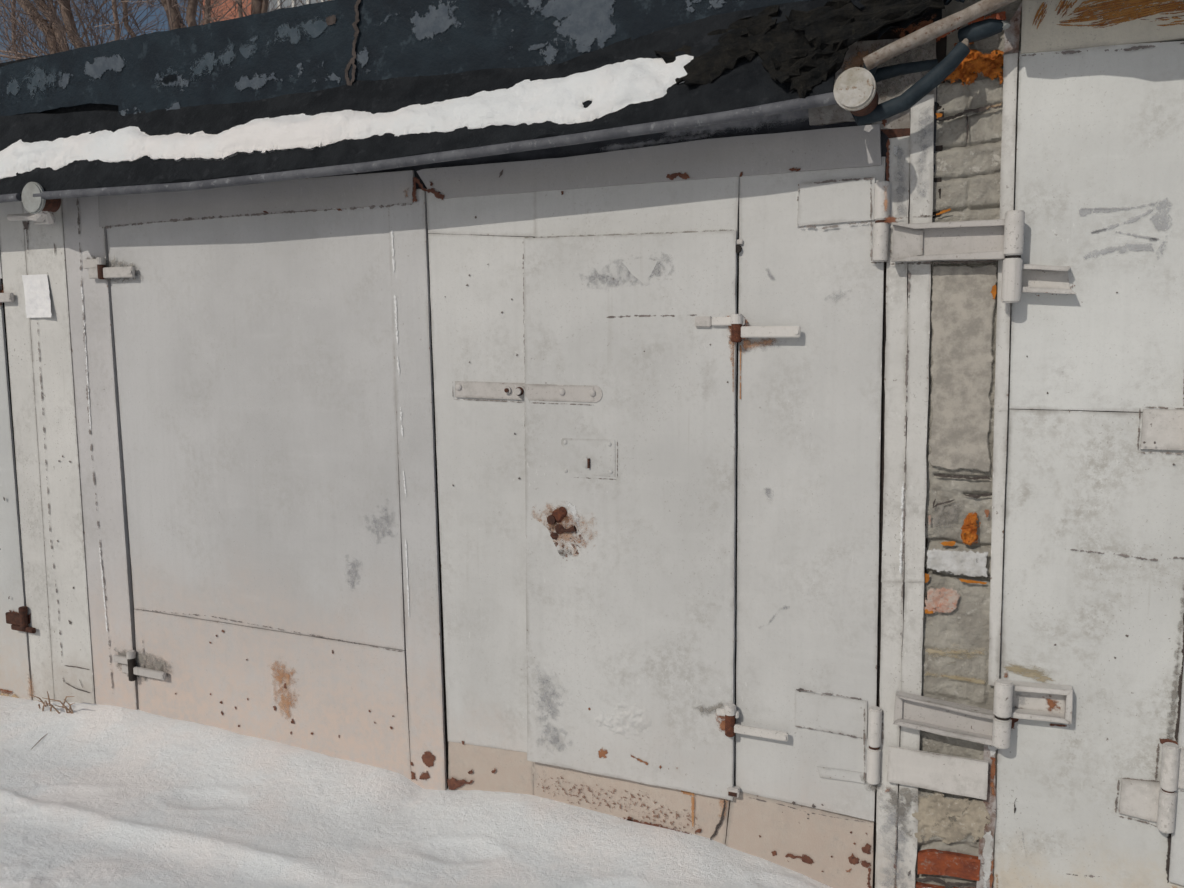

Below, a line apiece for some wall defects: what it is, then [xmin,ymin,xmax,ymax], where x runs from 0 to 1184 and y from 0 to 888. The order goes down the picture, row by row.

peeling [379,0,461,41]
peeling [524,0,616,65]
peeling [686,0,737,12]
peeling [7,54,127,98]
peeling [155,15,336,110]
peeling [355,46,375,81]
corrosion [538,503,587,559]
corrosion [410,751,435,780]
corrosion [447,769,473,790]
corrosion [536,773,701,835]
corrosion [771,851,823,872]
corrosion [846,831,871,888]